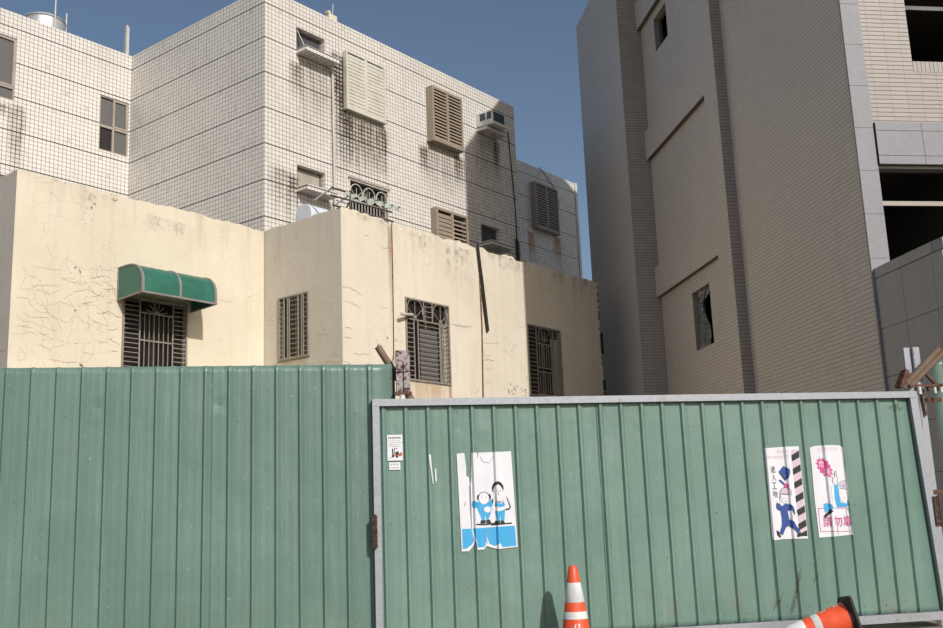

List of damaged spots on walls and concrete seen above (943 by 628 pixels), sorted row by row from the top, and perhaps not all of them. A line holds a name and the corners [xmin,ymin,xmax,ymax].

leakage [0,104,25,159]
leakage [332,53,387,168]
leakage [419,146,465,179]
crack [0,259,122,363]